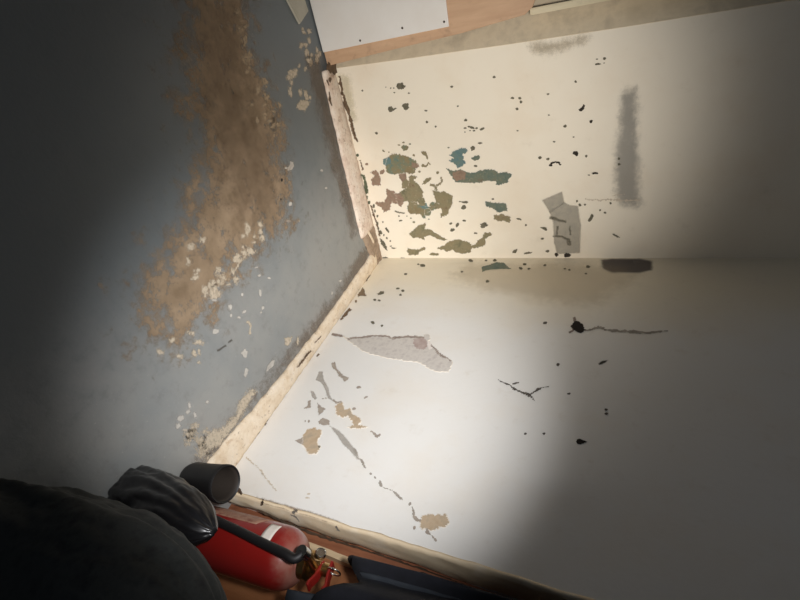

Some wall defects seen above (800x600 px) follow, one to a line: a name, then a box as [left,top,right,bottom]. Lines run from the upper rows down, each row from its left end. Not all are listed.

damp [138,0,296,345]
peeling [361,142,527,267]
peeling [186,221,265,302]
spalling [331,321,453,372]
crack [584,326,668,334]
spalling [295,398,381,455]
crack [498,379,549,401]
crack [246,448,467,586]